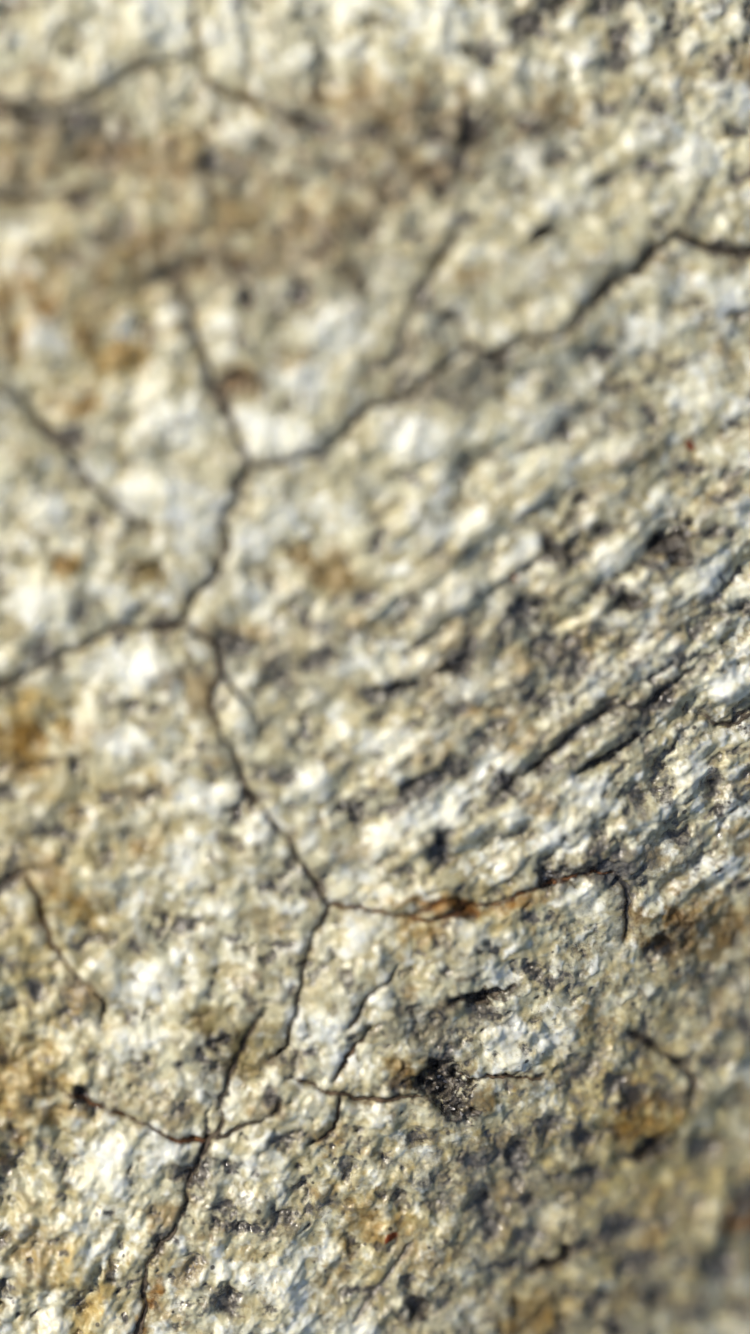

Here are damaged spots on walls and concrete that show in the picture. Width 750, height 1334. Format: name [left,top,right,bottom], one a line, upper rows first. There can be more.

crack [0,0,311,126]
crack [0,231,750,1056]
crack [458,1072,542,1081]
crack [630,1031,695,1088]
crack [64,1012,422,1334]